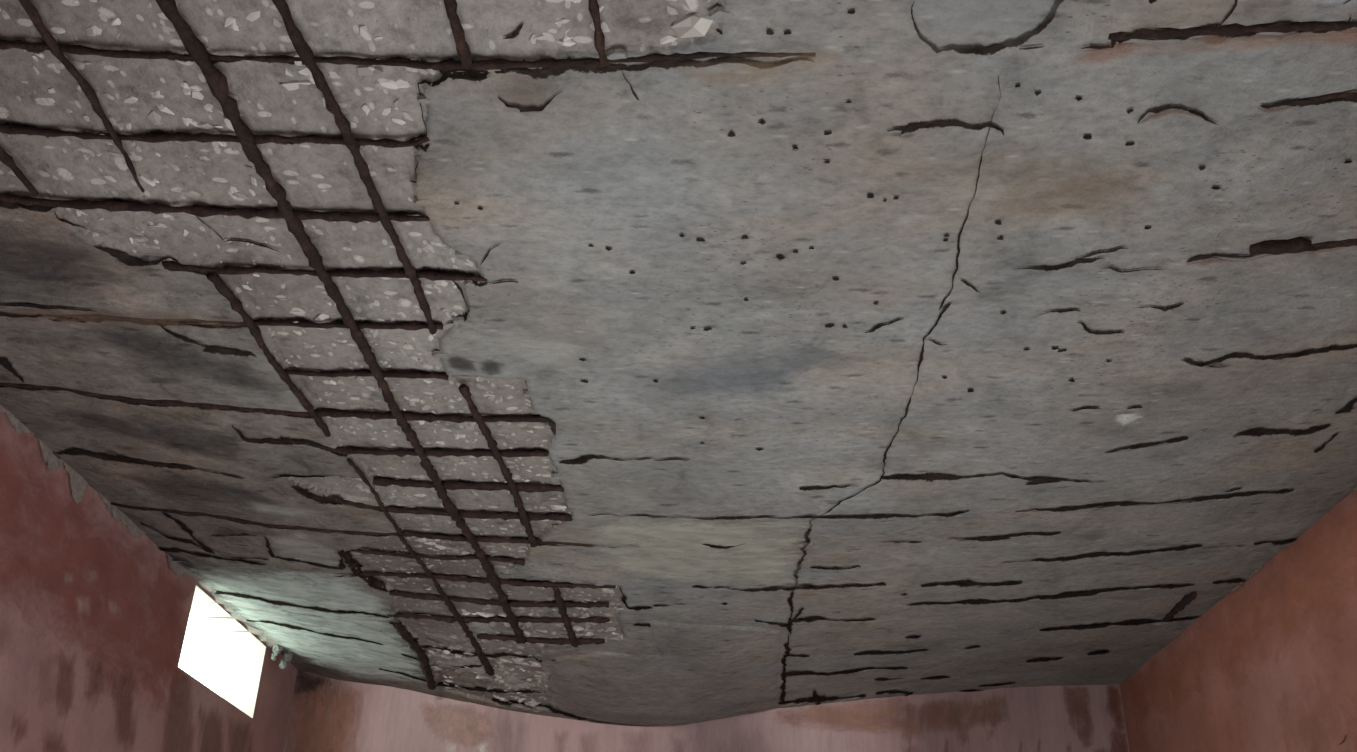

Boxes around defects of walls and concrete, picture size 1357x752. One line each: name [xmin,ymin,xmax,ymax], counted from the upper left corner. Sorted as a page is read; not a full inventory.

crack [503,23,524,39]
crack [1081,0,1357,52]
crack [1257,97,1357,112]
crack [1012,244,1357,273]
spalling [0,0,816,712]
crack [590,0,1296,707]
crack [1179,345,1357,369]
crack [1234,399,1357,453]
crack [558,455,690,465]
damp [0,461,247,752]
spalling [1163,592,1197,622]
damp [1065,688,1090,741]